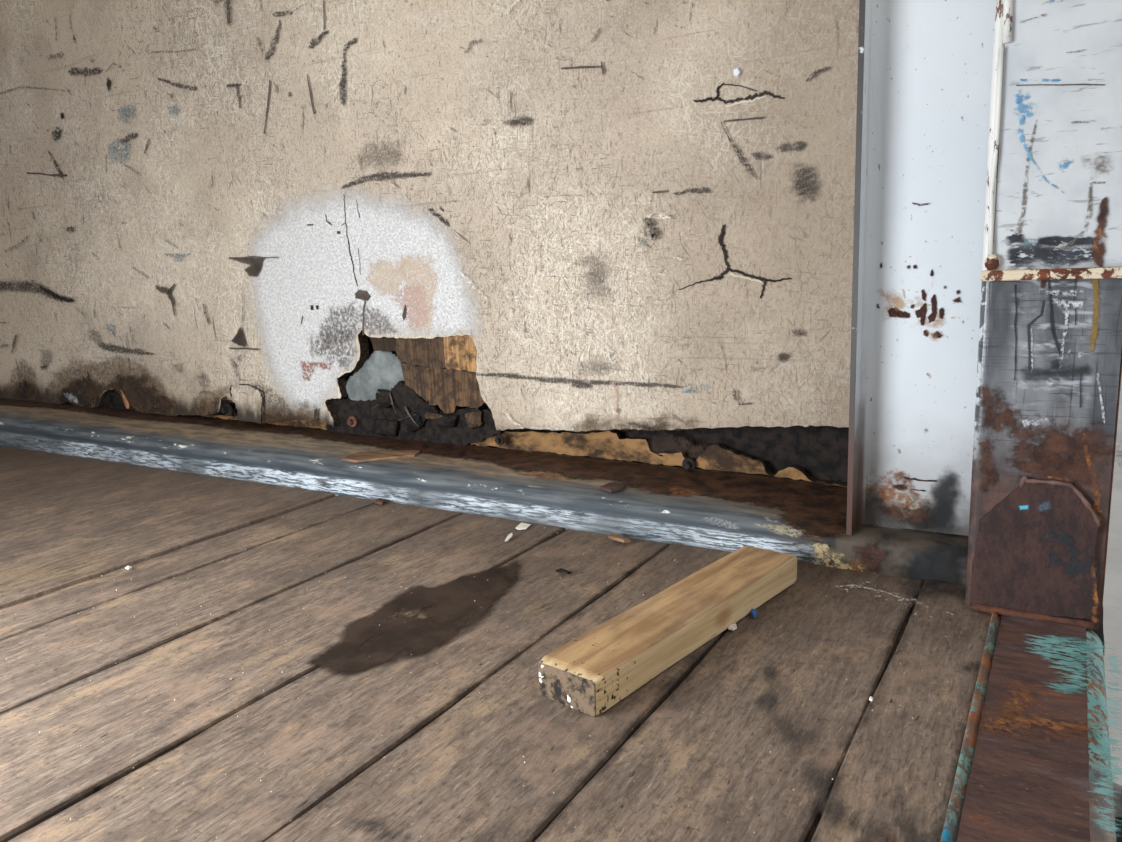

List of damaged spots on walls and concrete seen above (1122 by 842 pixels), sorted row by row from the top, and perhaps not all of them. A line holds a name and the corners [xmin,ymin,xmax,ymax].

crack [693,83,785,107]
crack [678,225,792,299]
rust [877,286,961,338]
damp [8,357,176,414]
rust [0,398,847,541]
rust [865,472,958,531]
rust [979,386,1122,522]
rust [1039,527,1098,622]
damp [308,561,519,675]
rust [984,681,1106,740]